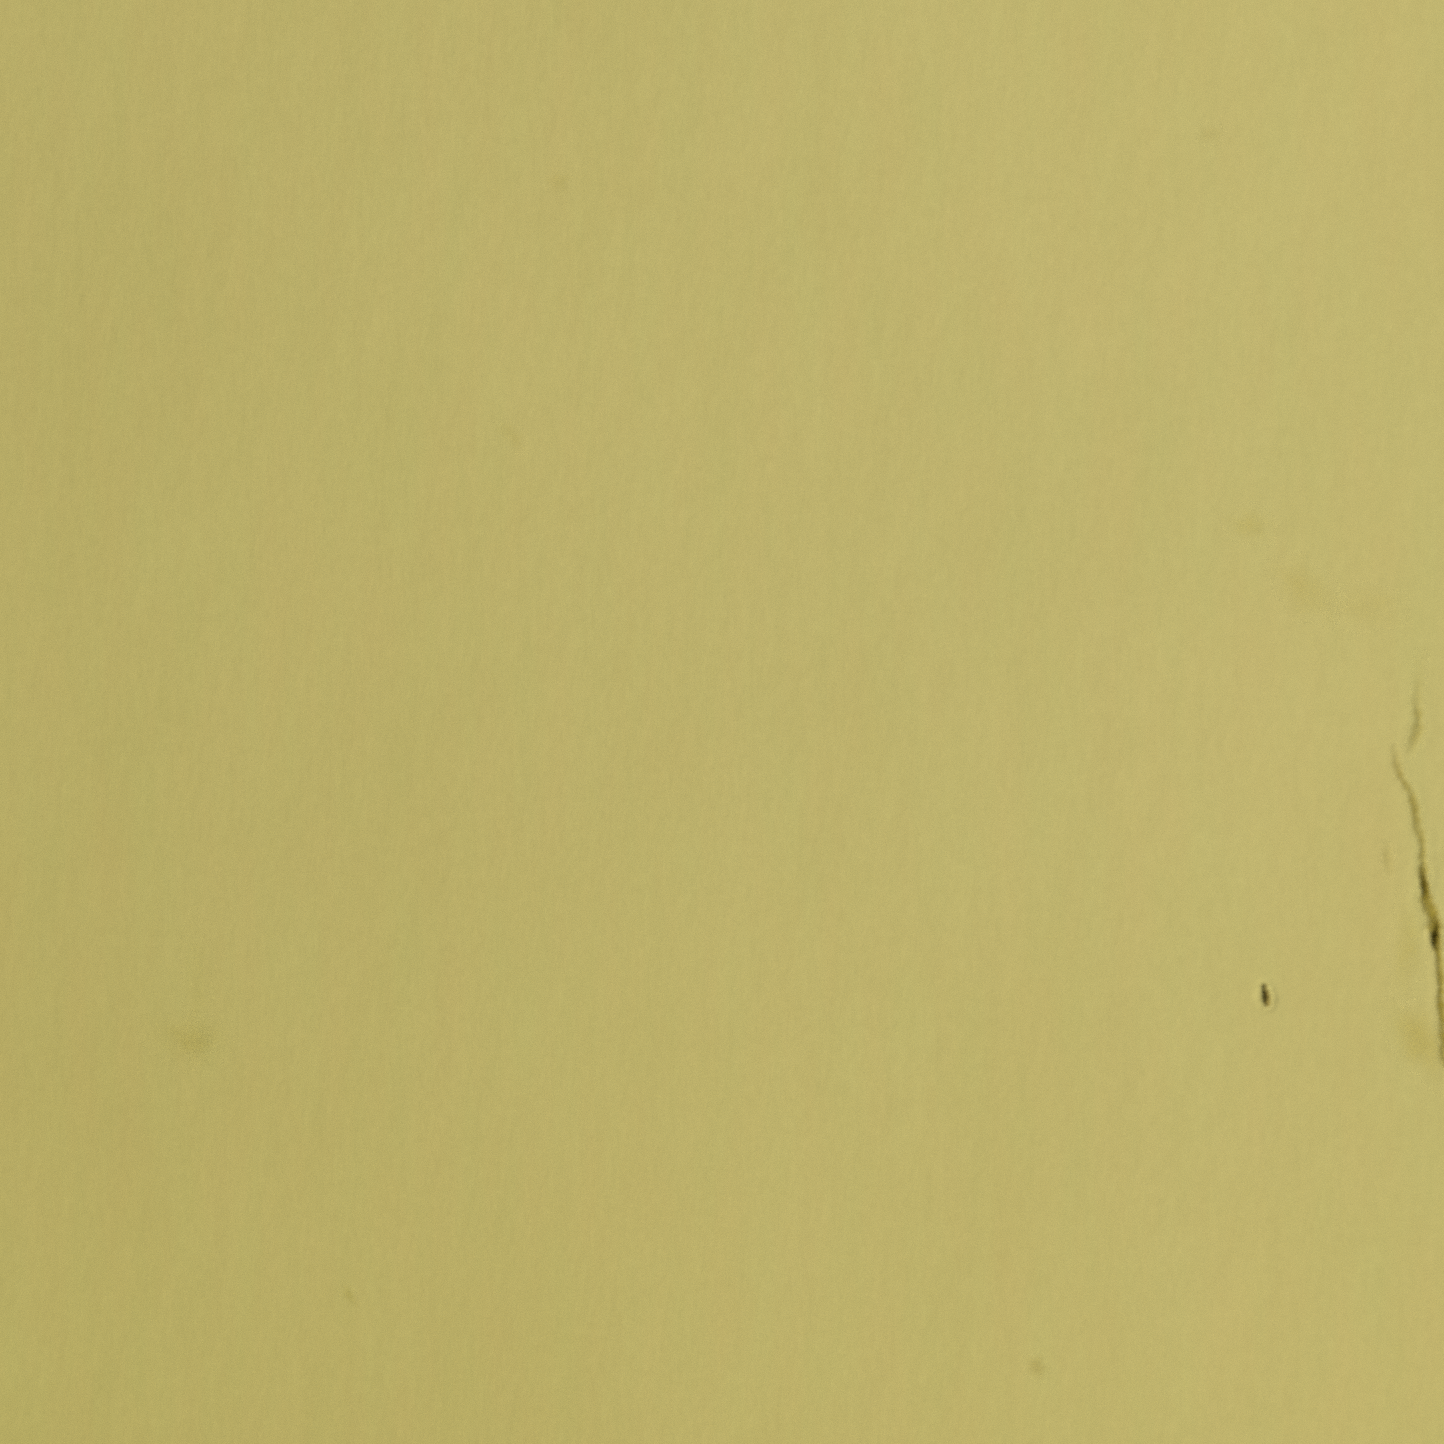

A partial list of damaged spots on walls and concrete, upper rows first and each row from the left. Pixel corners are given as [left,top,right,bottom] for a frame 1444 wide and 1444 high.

crack [1421,869,1444,1041]